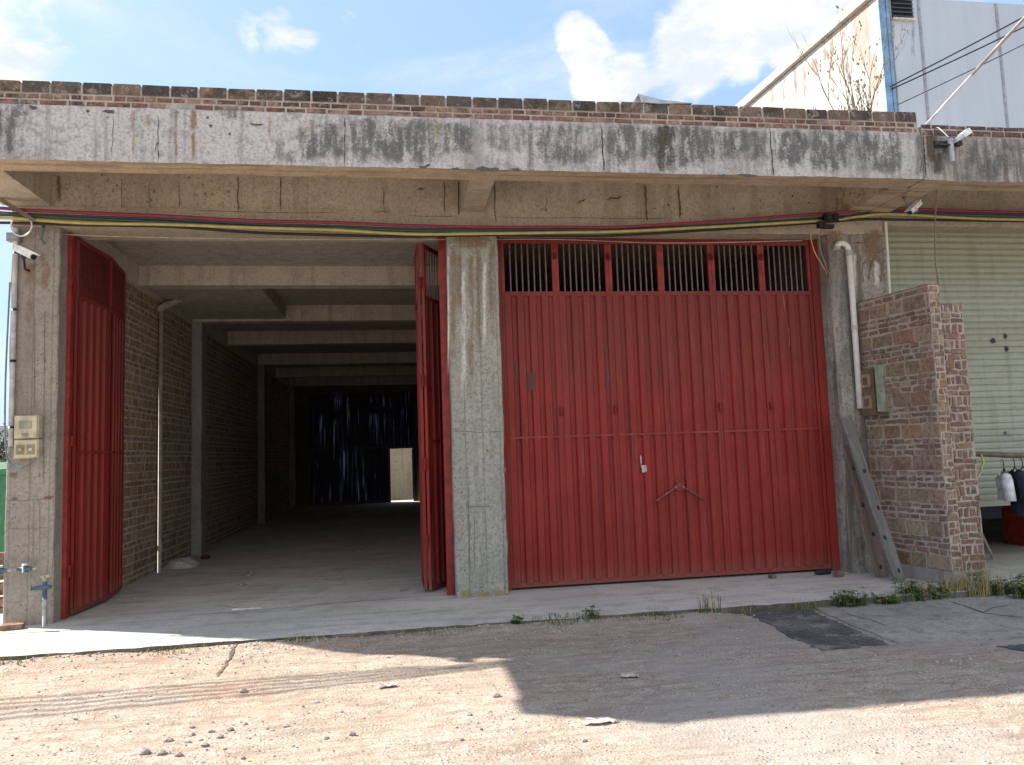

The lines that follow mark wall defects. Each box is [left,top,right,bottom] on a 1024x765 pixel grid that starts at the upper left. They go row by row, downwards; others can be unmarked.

water stain [276,118,471,161]
crack [599,127,607,167]
water stain [488,123,766,168]
water stain [917,134,946,173]